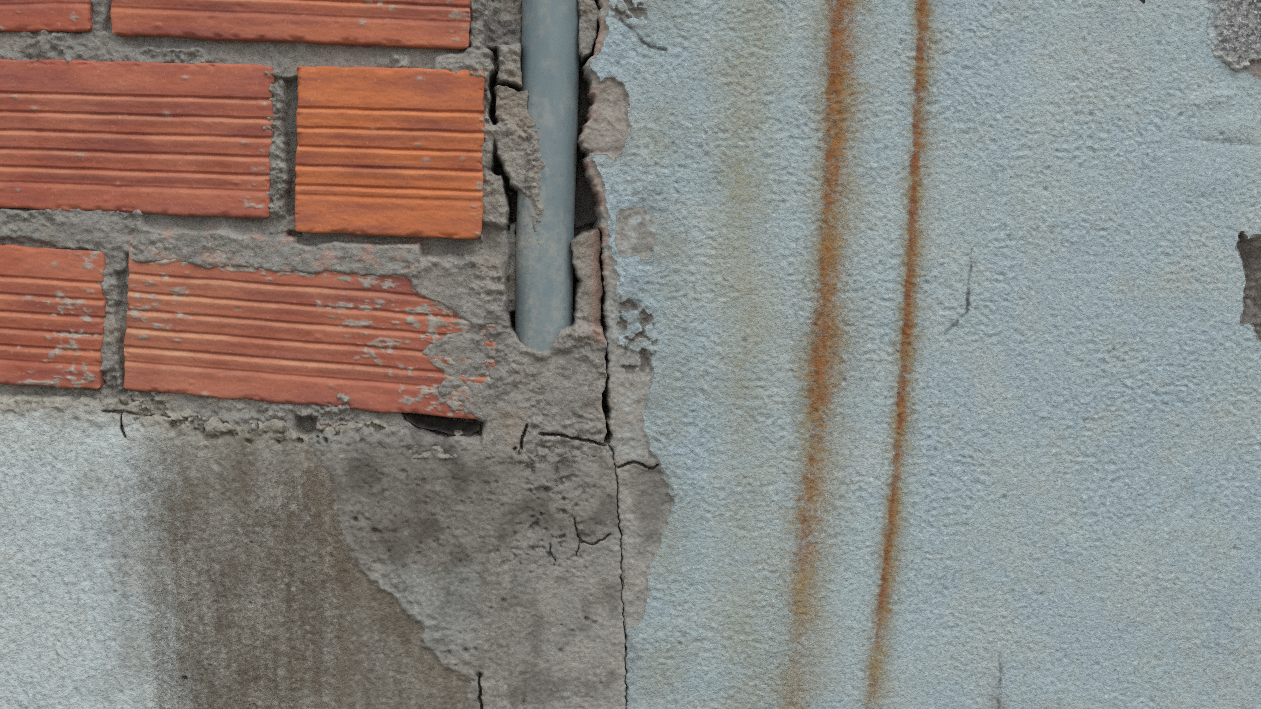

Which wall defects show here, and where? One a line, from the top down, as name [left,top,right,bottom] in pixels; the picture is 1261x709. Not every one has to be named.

peeling [1206,0,1261,78]
damp [159,439,469,709]
crack [514,426,658,486]
crack [550,519,622,561]
spalling [577,0,674,629]
rust [792,0,860,538]
rust [865,0,933,694]
spalling [1236,231,1261,342]